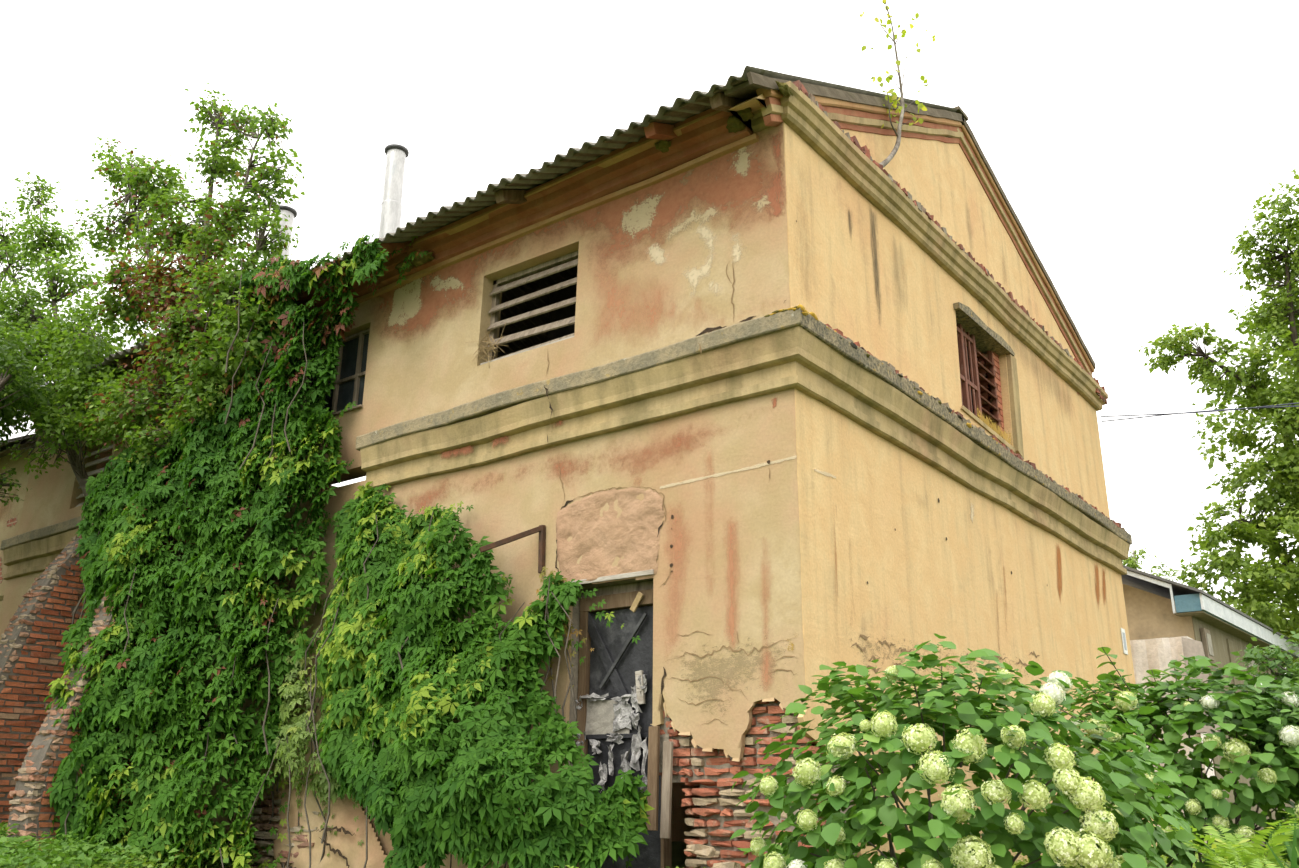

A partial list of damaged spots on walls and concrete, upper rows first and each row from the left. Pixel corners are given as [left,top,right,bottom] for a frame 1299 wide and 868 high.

peeling [378,136,781,335]
leakage [871,215,880,307]
rust [1095,566,1106,603]
crack [661,631,797,725]
spalling [658,693,834,868]